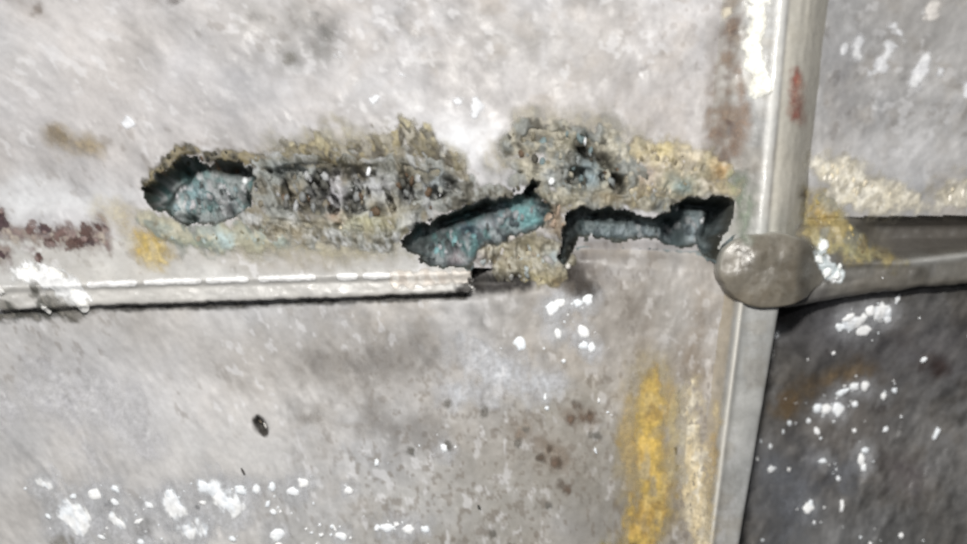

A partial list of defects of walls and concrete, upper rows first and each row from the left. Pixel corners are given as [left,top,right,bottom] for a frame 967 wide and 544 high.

rust [724,18,739,36]
peeling [149,146,248,215]
rust [135,90,749,287]
rust [0,207,123,263]
peeling [428,186,533,255]
peeling [590,206,704,243]
rust [802,189,893,266]
peeling [389,269,471,289]
rust [567,405,594,424]
rust [536,445,568,467]
rust [621,368,677,544]